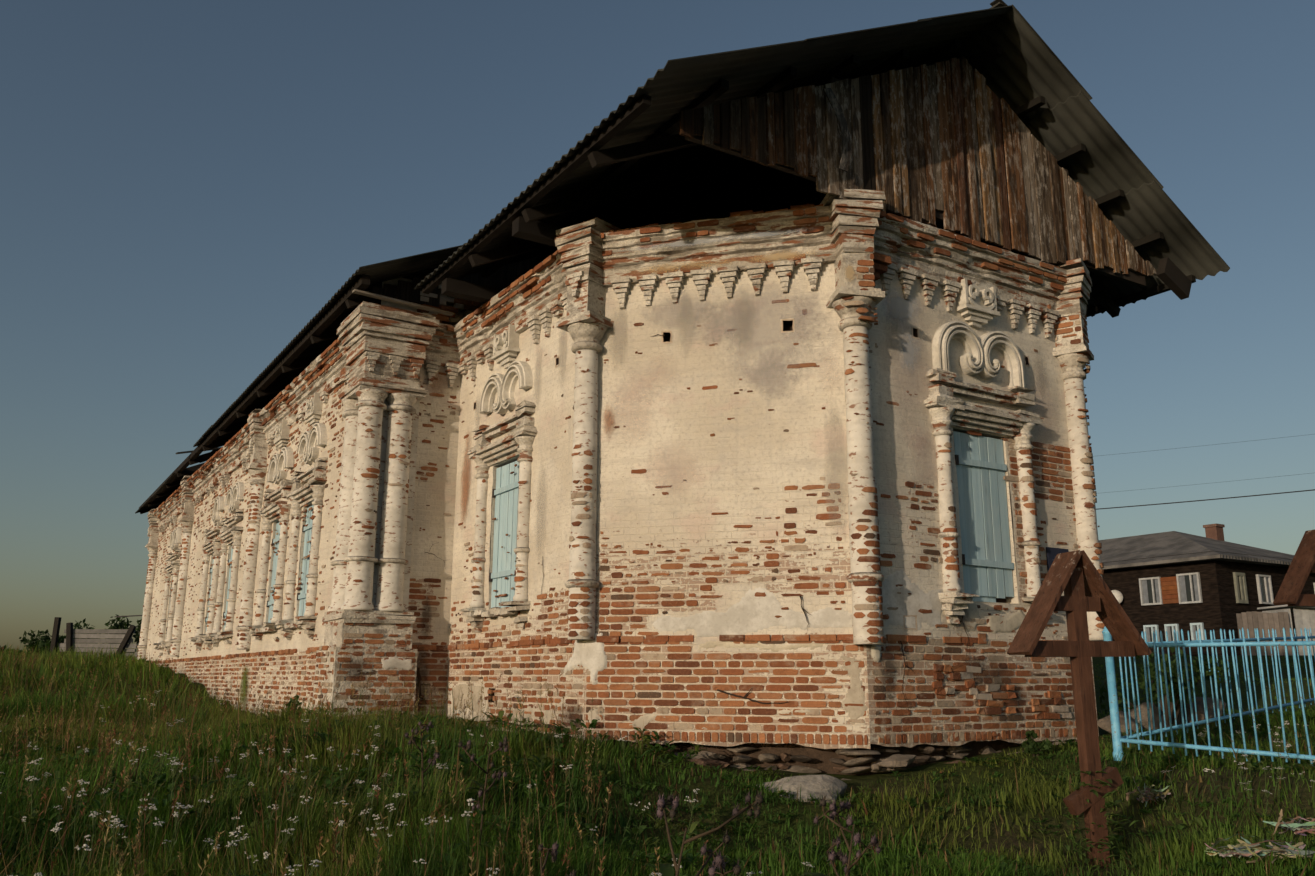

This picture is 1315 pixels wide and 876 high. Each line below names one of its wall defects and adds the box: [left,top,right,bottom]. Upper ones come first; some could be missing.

flaking render [137,208,1104,745]